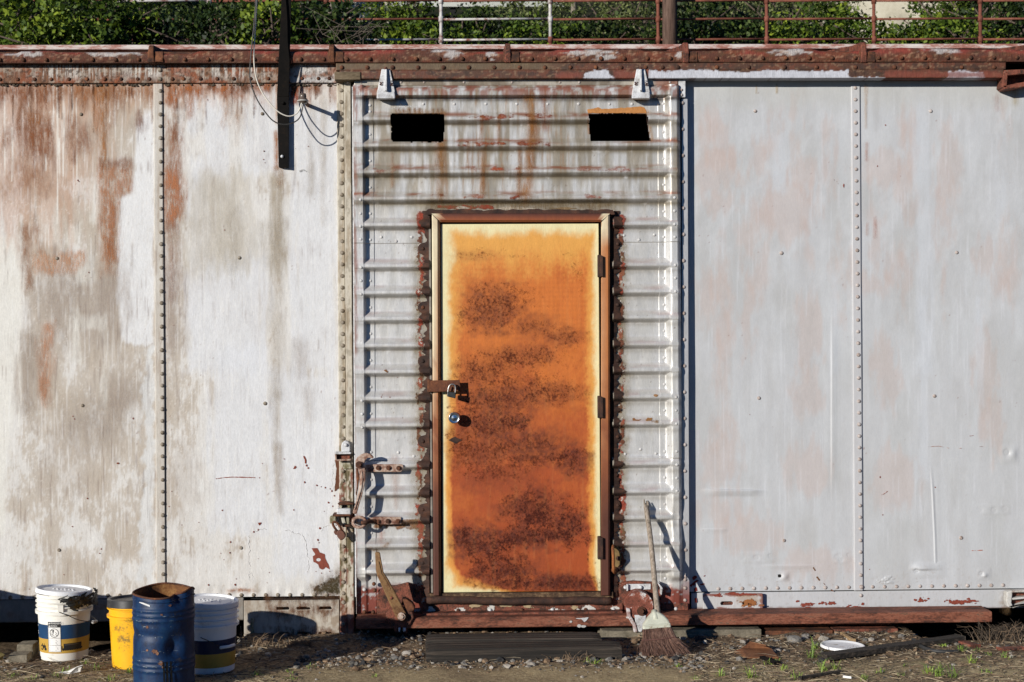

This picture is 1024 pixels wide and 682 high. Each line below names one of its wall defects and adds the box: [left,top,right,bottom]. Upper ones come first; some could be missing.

corrosion [0,84,149,260]
corrosion [458,97,551,200]
peeling [312,527,330,574]
corrosion [456,490,601,590]
peeling [796,600,864,608]